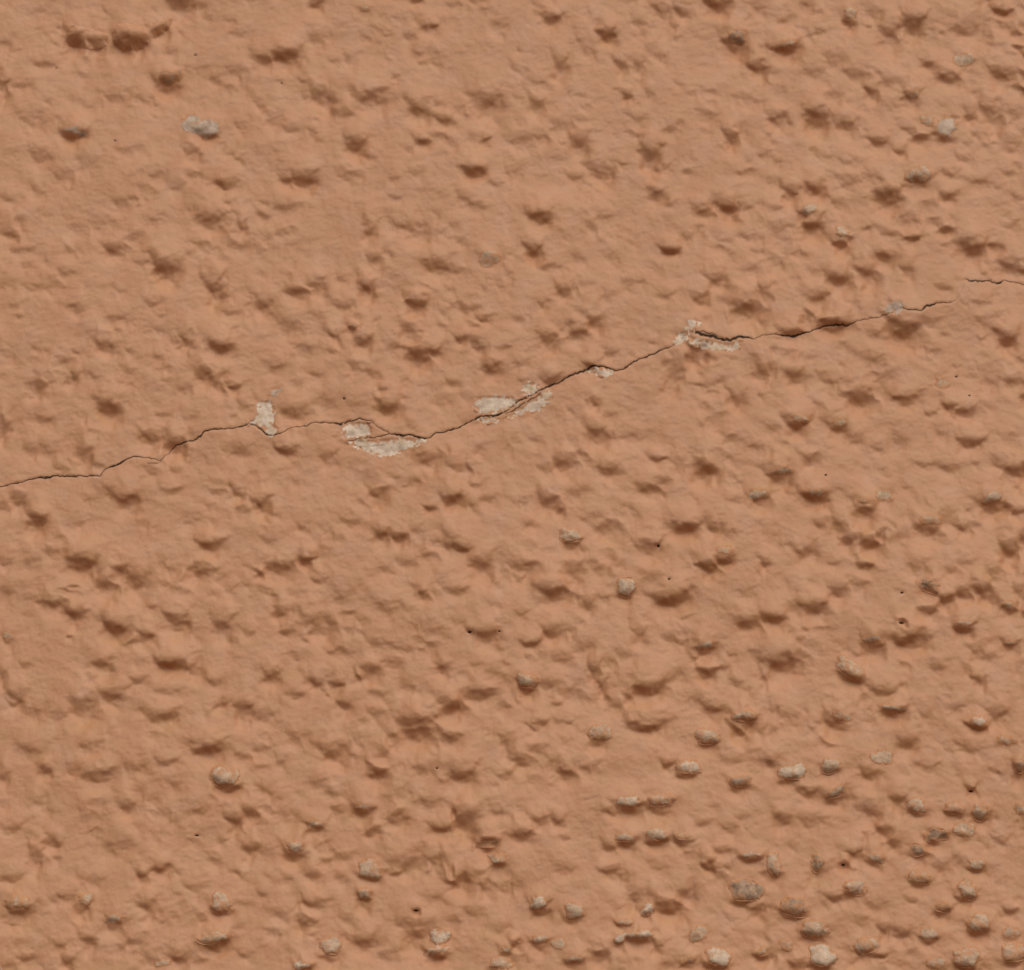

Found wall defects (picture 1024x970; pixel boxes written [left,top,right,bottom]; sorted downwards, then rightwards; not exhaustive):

peeling [671,318,743,353]
peeling [246,399,280,439]
crack [0,279,1024,487]
peeling [472,381,555,425]
peeling [338,420,429,459]